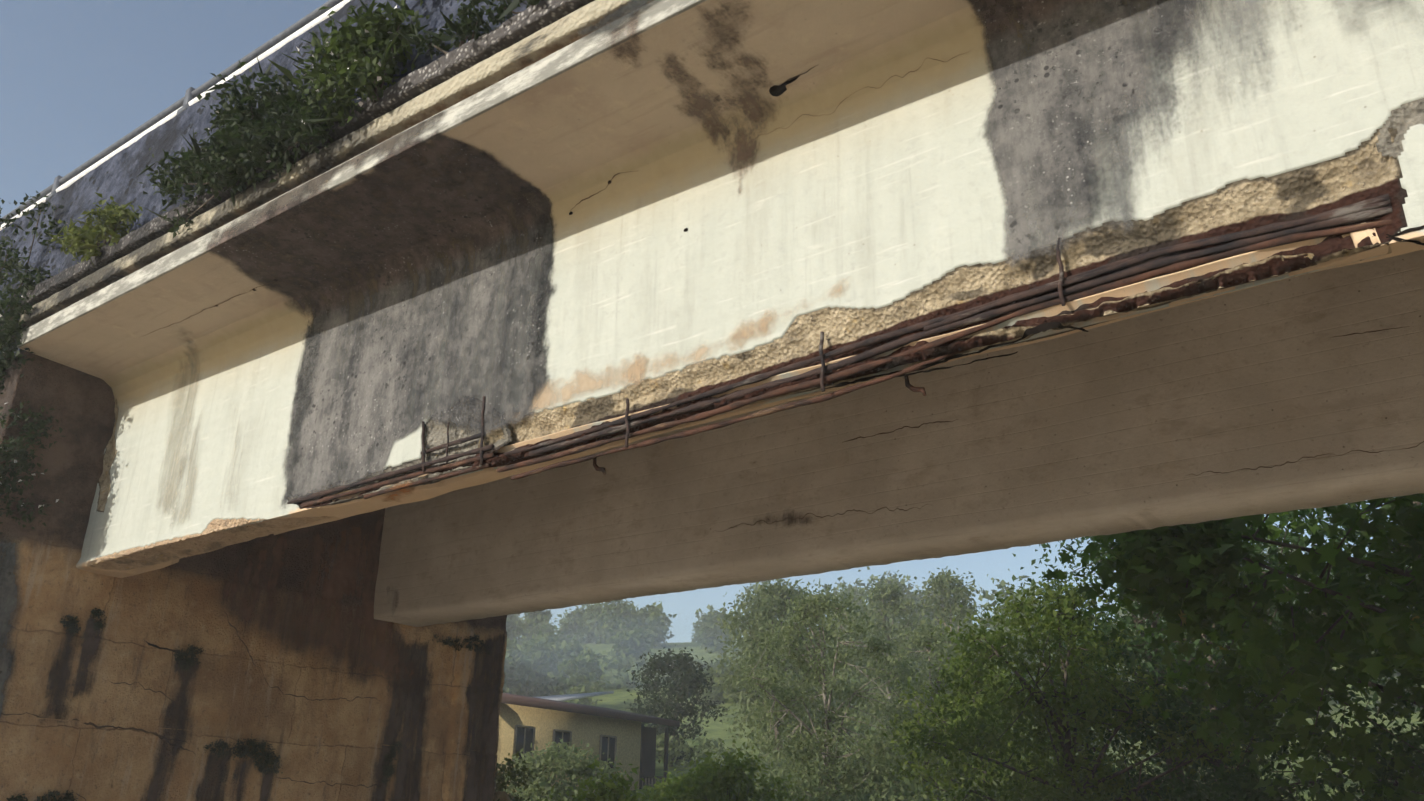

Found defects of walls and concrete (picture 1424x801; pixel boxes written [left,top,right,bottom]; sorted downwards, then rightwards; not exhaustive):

damp [665,5,771,193]
crack [753,53,965,140]
damp [969,0,1265,263]
damp [207,112,554,503]
spalling [88,98,1424,571]
crack [1386,225,1424,246]
crack [1189,441,1424,476]
damp [43,617,104,722]
crack [2,712,196,756]
crack [144,640,179,652]
damp [220,514,432,801]
damp [463,632,505,801]